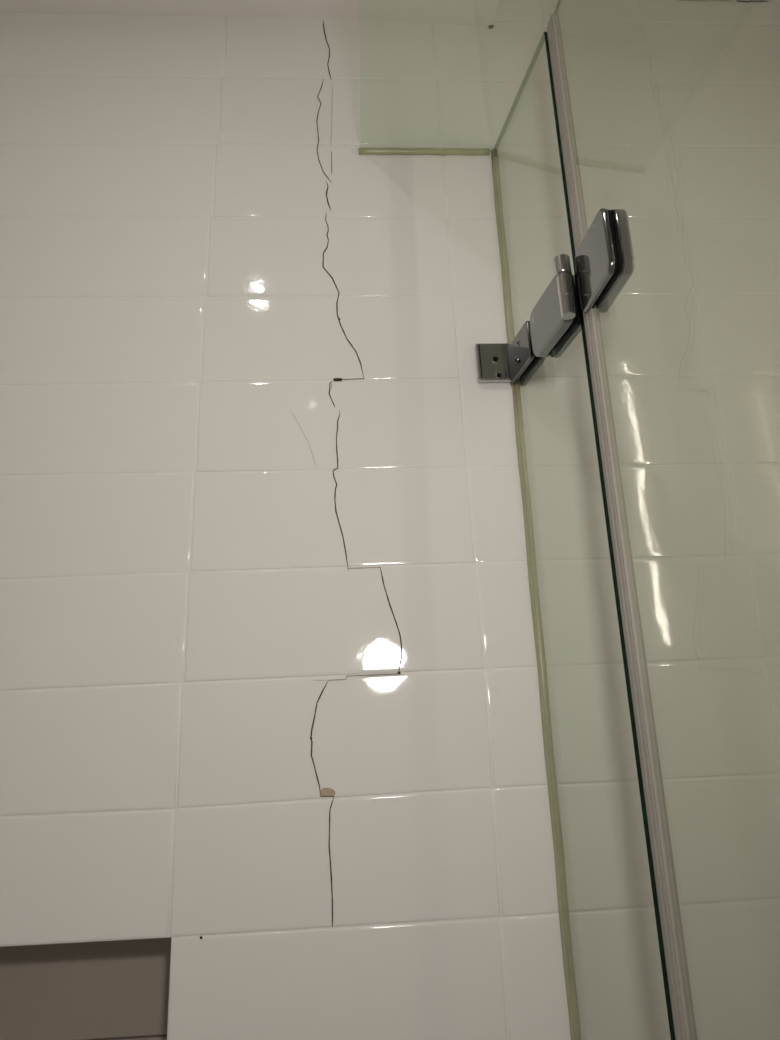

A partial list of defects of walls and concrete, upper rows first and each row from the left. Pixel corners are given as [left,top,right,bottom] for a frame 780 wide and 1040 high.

peeling [321,788,335,796]
crack [292,23,402,927]